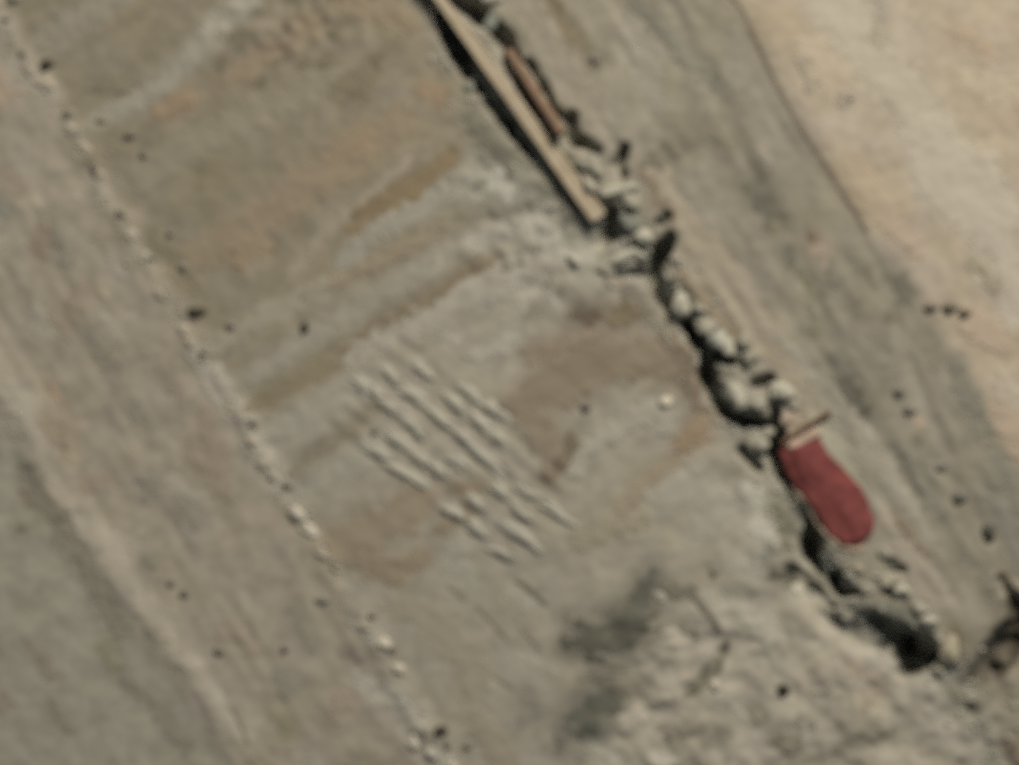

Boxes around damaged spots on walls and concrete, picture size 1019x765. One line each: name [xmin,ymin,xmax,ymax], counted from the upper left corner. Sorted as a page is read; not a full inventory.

crack [732,0,869,233]
crack [740,448,761,472]
crack [513,580,548,606]
crack [682,590,730,700]